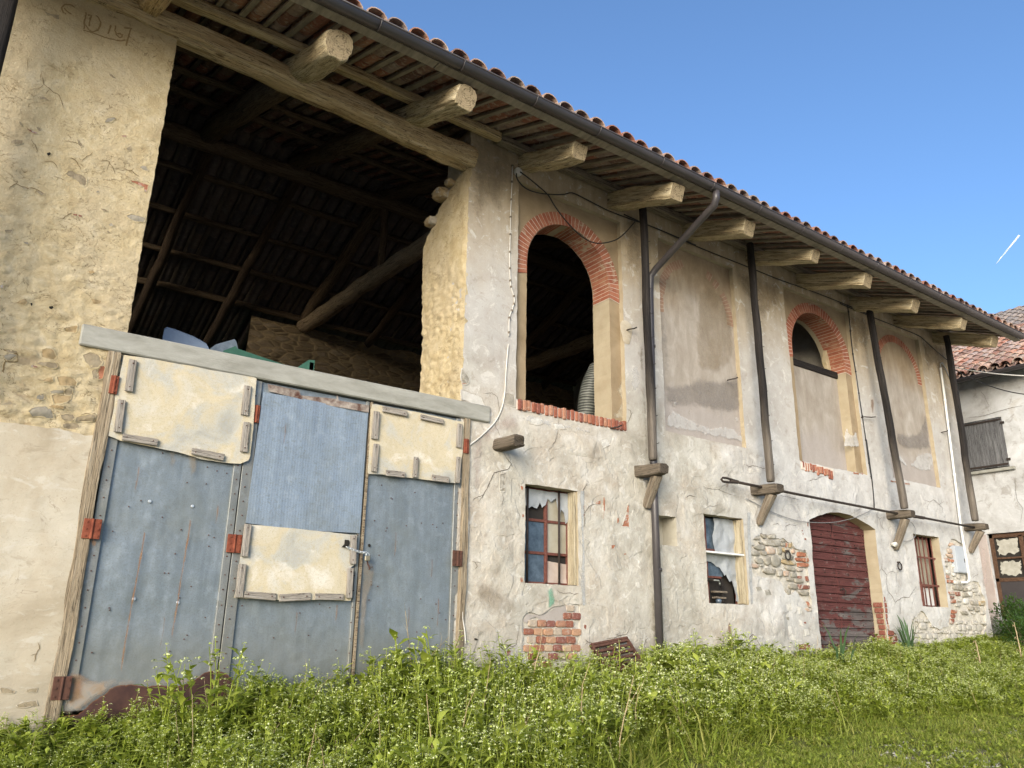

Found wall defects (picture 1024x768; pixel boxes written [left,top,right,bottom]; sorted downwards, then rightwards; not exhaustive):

crack [9,141,138,193]
crack [473,393,512,504]
spalling [506,603,587,668]
spalling [750,522,820,652]
spalling [912,539,986,648]
corrosion [59,671,236,737]